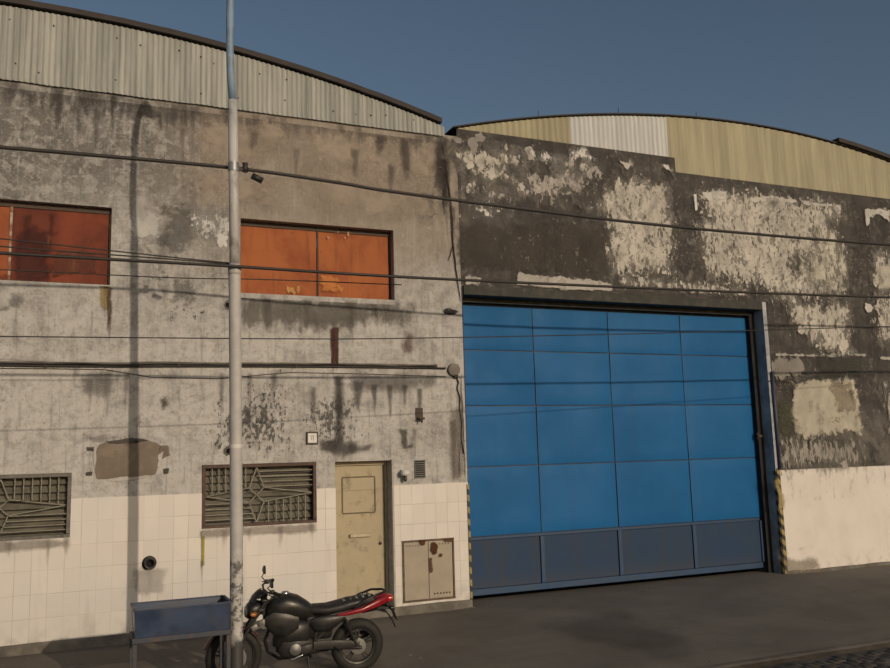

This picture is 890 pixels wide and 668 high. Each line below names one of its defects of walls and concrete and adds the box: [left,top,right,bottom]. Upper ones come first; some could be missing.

flaking render [306,131,442,216]
rust [101,286,111,323]
damp [241,298,411,331]
peeling [450,131,890,475]
rust [331,327,339,366]
damp [195,399,230,449]
damp [242,380,295,462]
damp [303,376,434,454]
spalling [86,438,170,482]